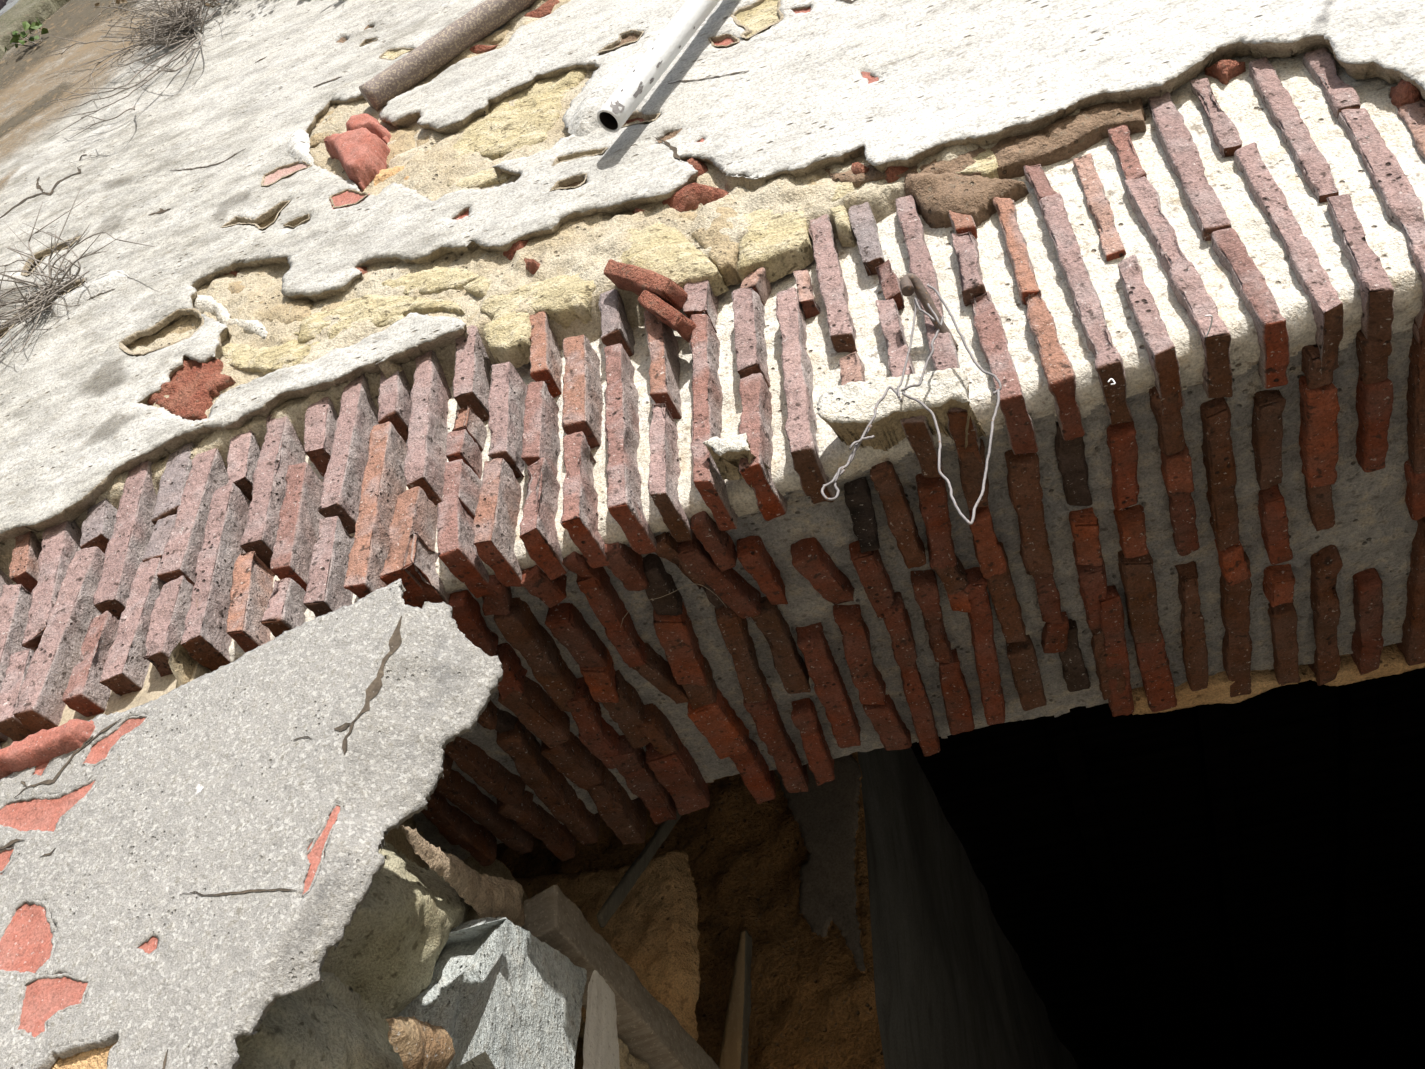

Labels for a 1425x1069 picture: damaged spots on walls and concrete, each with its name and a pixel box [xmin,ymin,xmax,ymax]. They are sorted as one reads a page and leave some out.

spalling [861,72,879,84]
spalling [655,128,682,143]
spalling [261,160,312,187]
spalling [549,147,608,192]
spalling [220,200,310,230]
spalling [329,189,370,209]
spalling [118,308,204,356]
crack [293,616,402,754]
spalling [0,714,149,875]
spalling [298,803,344,899]
spalling [138,936,158,954]
spalling [0,898,121,1069]